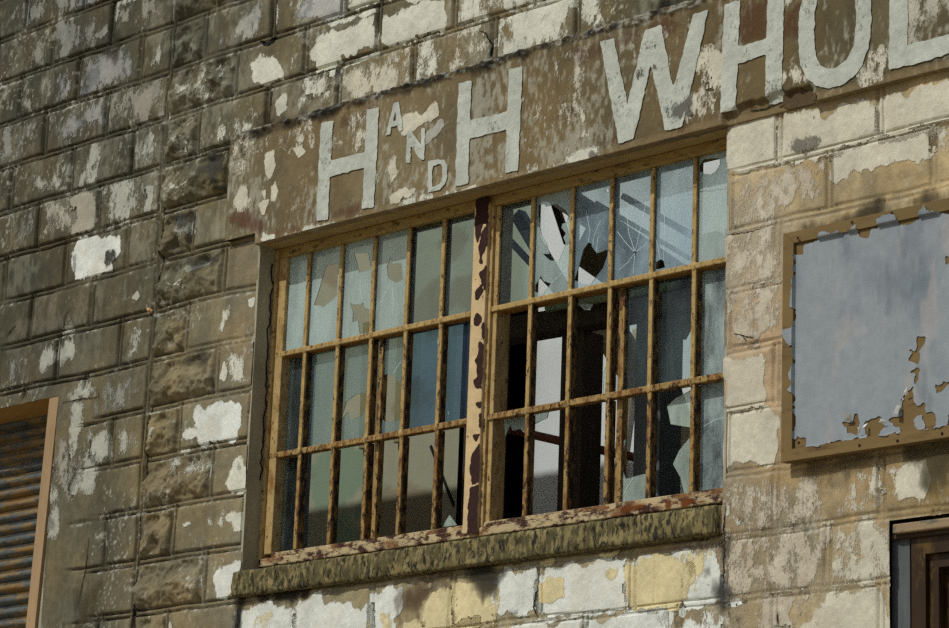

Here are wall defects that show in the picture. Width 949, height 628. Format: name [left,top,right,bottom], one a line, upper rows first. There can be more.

peeling [0,0,225,164]
peeling [4,142,154,280]
corrosion [474,196,490,300]
corrosion [473,313,485,389]
crack [143,406,154,480]
peeling [170,400,242,485]
peeling [225,455,246,495]
corrosion [467,401,482,534]
crack [130,515,141,628]